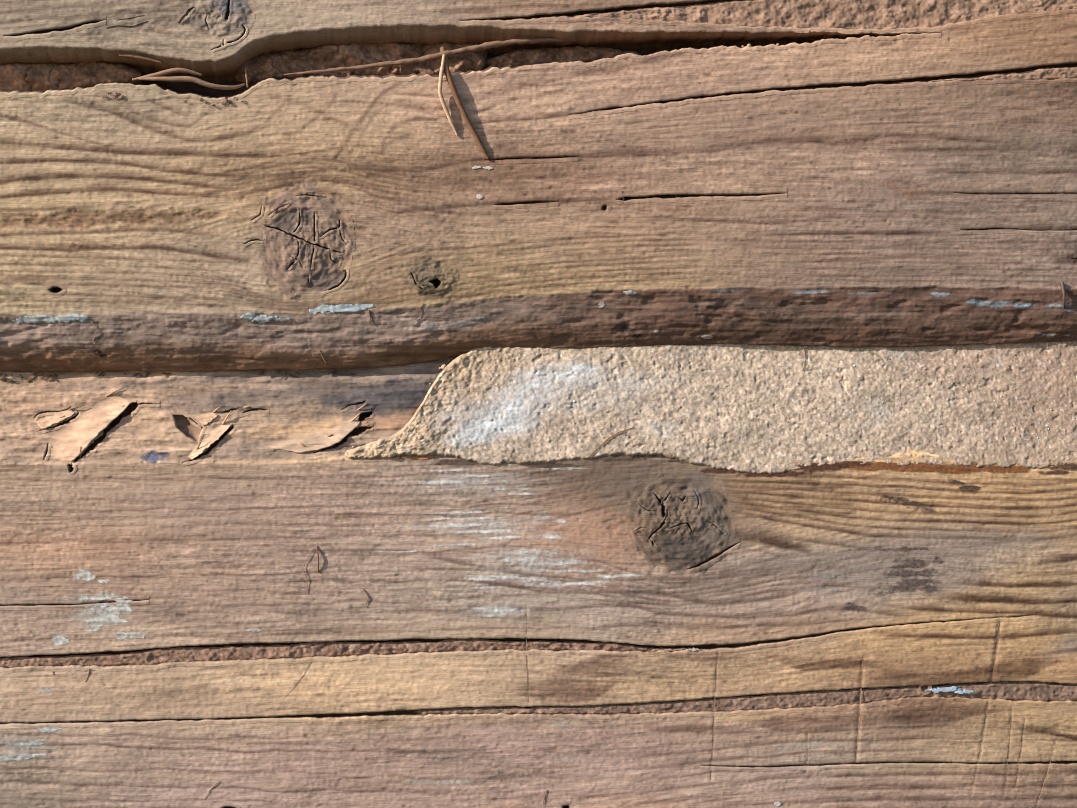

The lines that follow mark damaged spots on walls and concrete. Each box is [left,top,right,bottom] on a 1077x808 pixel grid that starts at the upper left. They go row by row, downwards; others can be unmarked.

crack [0,0,1077,103]
crack [569,58,1077,119]
crack [493,197,559,210]
crack [616,189,787,205]
peeling [36,395,132,462]
spalling [170,412,231,459]
peeling [259,417,361,453]
crack [0,611,1035,682]
crack [0,677,1077,729]